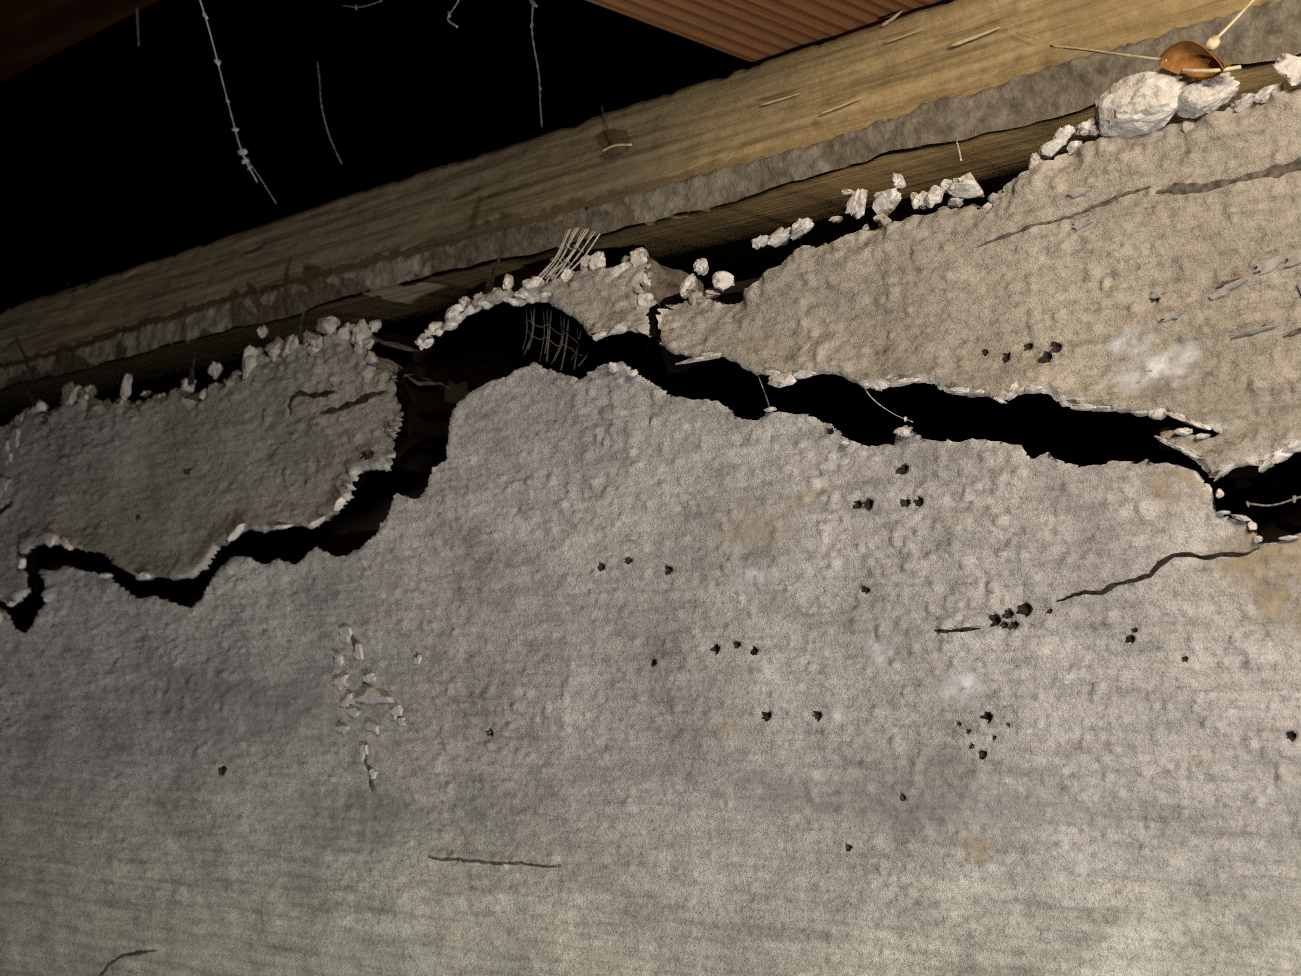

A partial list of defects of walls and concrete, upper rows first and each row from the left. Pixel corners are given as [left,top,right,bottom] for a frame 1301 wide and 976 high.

spalling [752,53,1301,265]
spalling [0,247,745,514]
crack [0,263,1301,634]
spalling [982,341,1062,363]